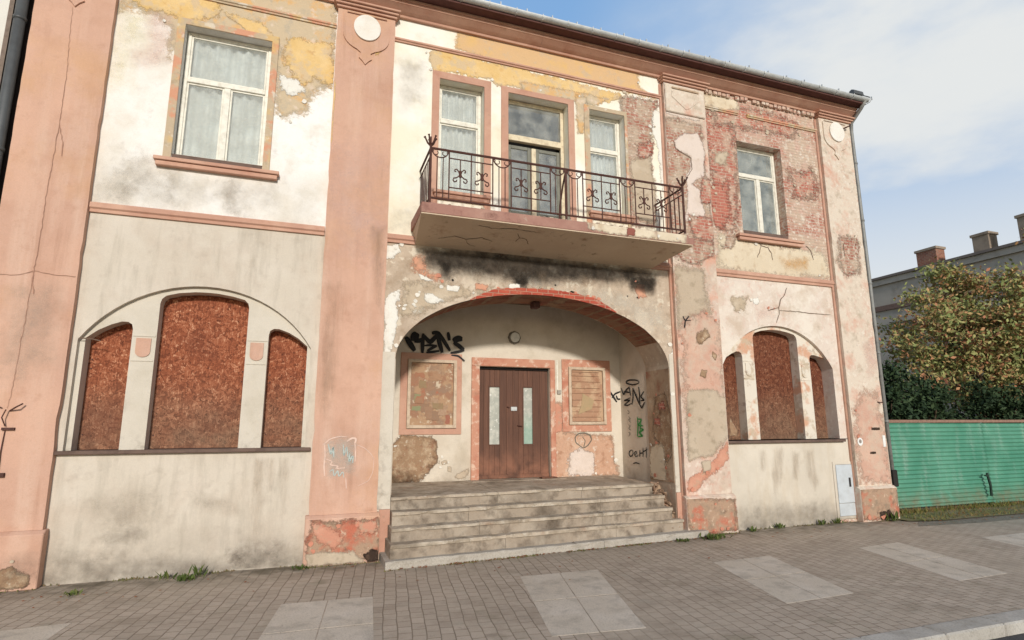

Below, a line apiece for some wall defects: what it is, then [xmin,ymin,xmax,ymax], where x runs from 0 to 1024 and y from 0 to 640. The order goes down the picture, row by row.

peeling [117,0,337,123]
flaking render [782,166,820,202]
peeling [384,33,801,483]
water stain [630,278,654,291]
crack [768,288,830,323]
flaking render [687,418,739,534]
peeling [851,388,900,521]
flaking render [304,517,380,567]